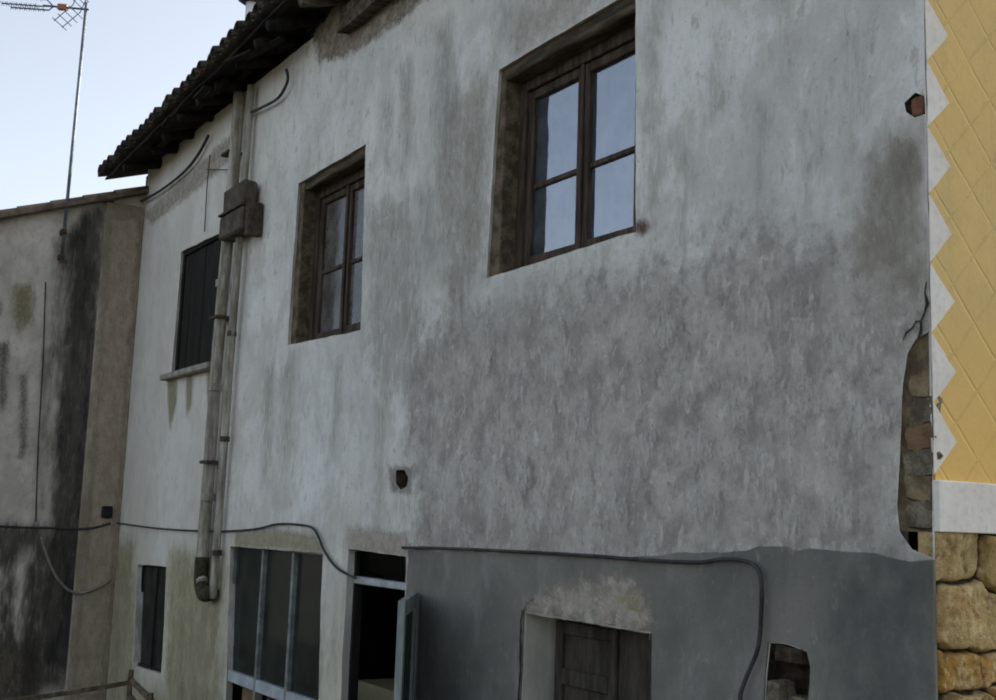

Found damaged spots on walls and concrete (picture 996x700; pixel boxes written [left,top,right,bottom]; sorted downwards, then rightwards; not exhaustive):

flaking render [905,93,927,118]
peeling [347,223,943,562]
water stain [0,206,104,700]
flaking render [526,572,651,632]
spalling [766,643,810,700]